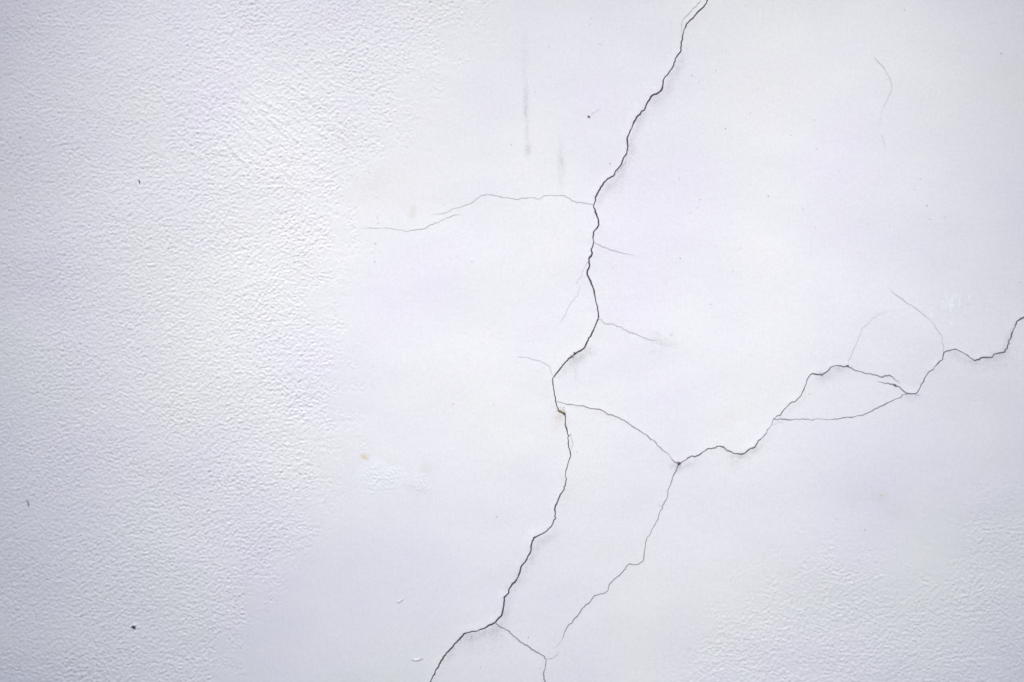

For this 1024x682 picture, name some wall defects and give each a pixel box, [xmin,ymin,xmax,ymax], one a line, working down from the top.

crack [398,0,1024,682]